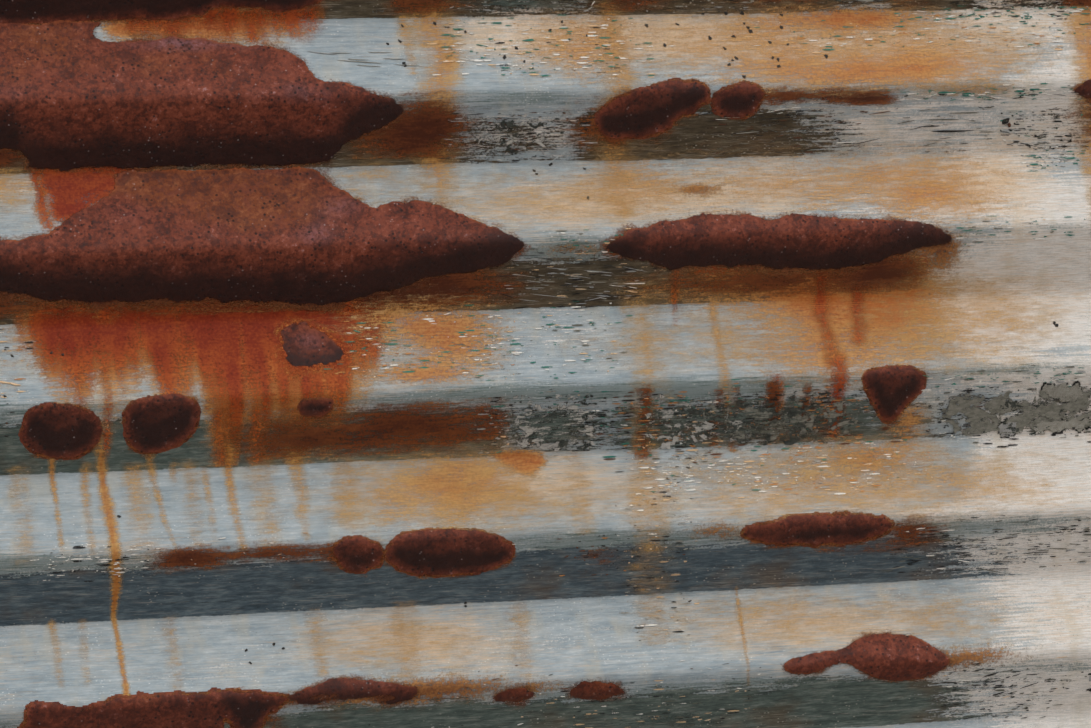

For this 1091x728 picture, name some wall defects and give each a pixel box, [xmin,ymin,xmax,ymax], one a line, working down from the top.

rust [522,0,1040,553]
rust [1060,0,1091,174]